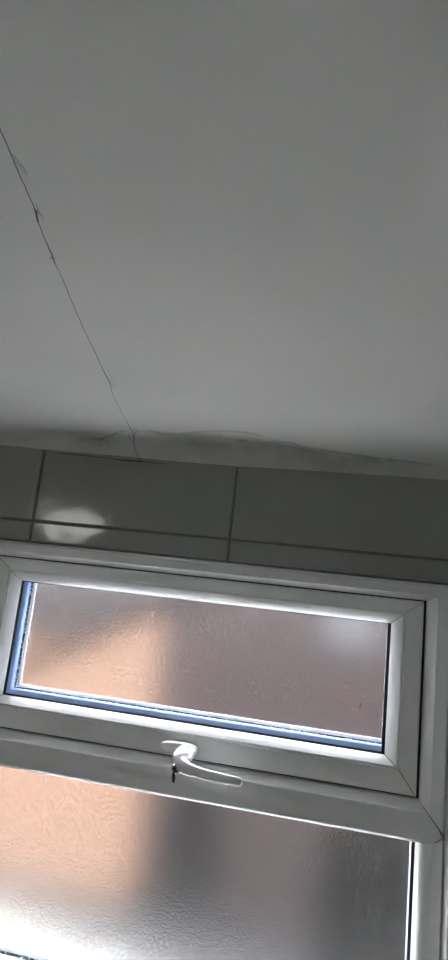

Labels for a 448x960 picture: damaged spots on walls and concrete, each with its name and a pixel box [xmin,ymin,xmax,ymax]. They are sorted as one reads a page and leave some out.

crack [0,129,164,464]